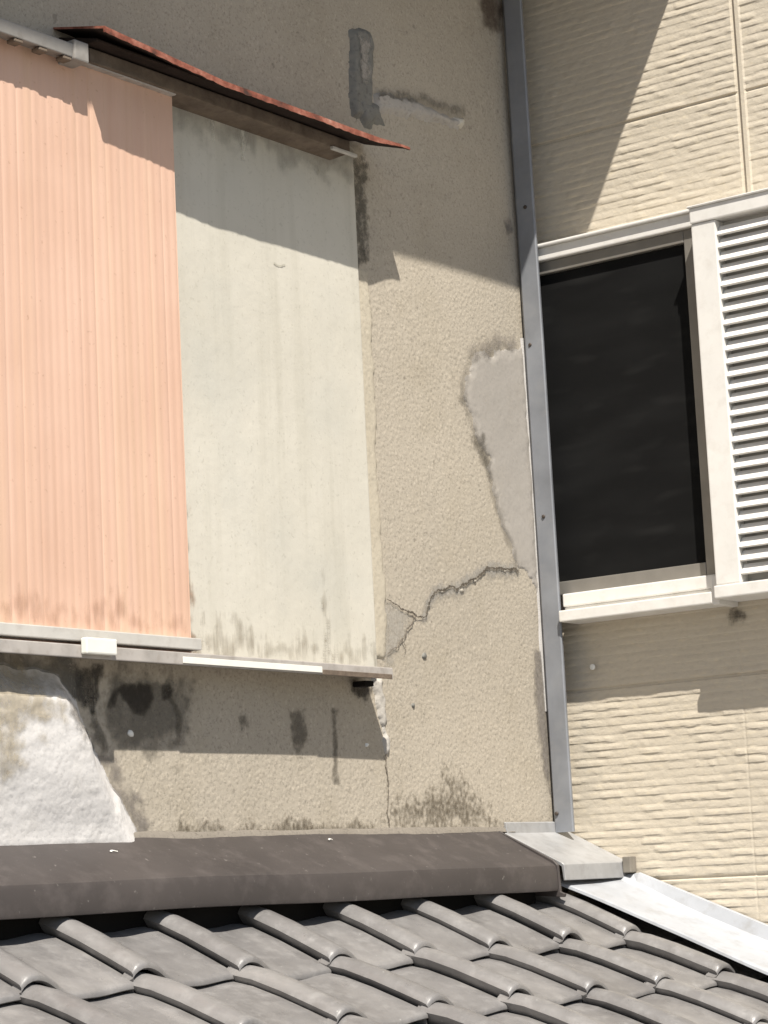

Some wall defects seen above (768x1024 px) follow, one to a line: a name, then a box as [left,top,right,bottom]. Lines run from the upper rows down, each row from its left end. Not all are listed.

crack [385,562,519,661]
leakage [1,660,182,749]
leakage [291,714,307,744]
crack [383,754,391,828]